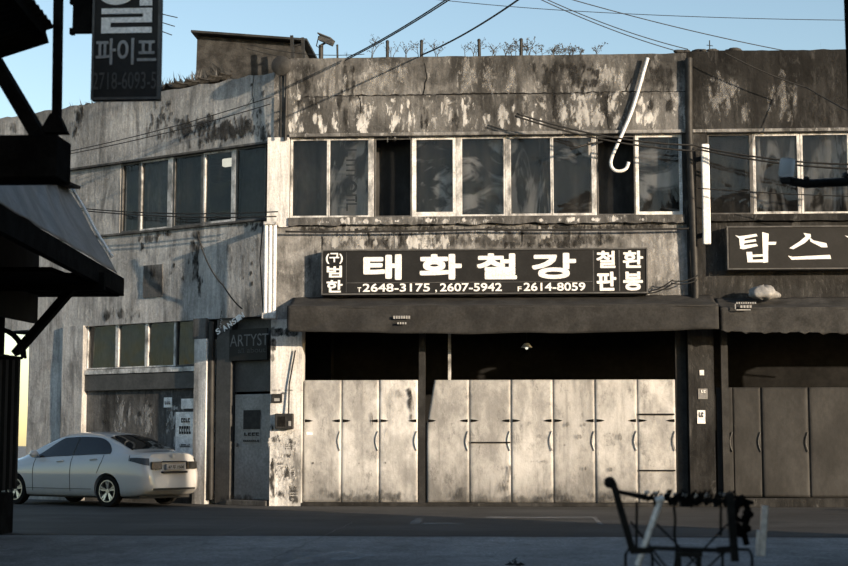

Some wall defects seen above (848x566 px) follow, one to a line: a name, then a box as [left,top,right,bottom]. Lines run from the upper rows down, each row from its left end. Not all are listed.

leakage [337,66,355,124]
peeling [356,106,372,133]
peeling [385,98,415,137]
peeling [428,98,468,129]
peeling [483,104,543,129]
leakage [533,62,609,120]
leakage [191,231,201,293]